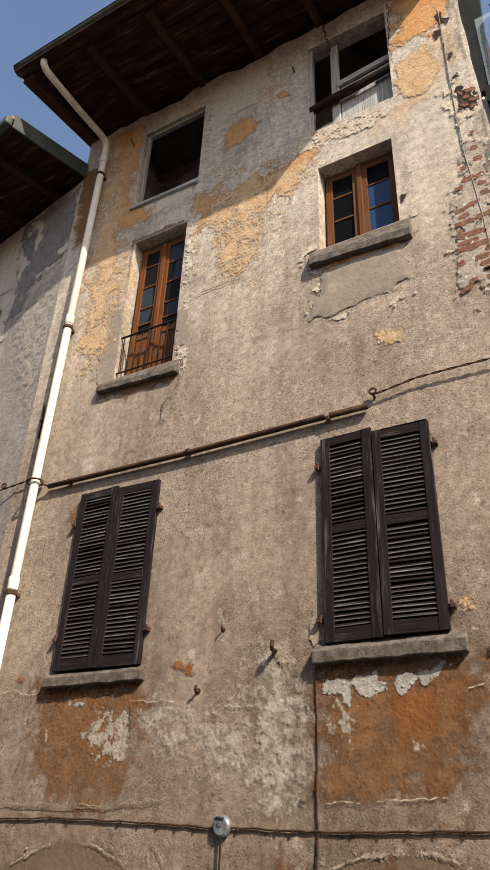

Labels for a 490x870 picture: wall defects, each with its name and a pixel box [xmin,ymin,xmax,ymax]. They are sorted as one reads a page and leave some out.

peeling [386,0,480,126]
peeling [0,186,81,345]
peeling [70,52,390,376]
flaking render [443,130,490,298]
peeling [80,705,131,768]
peeling [319,660,452,750]
crack [315,841,473,870]